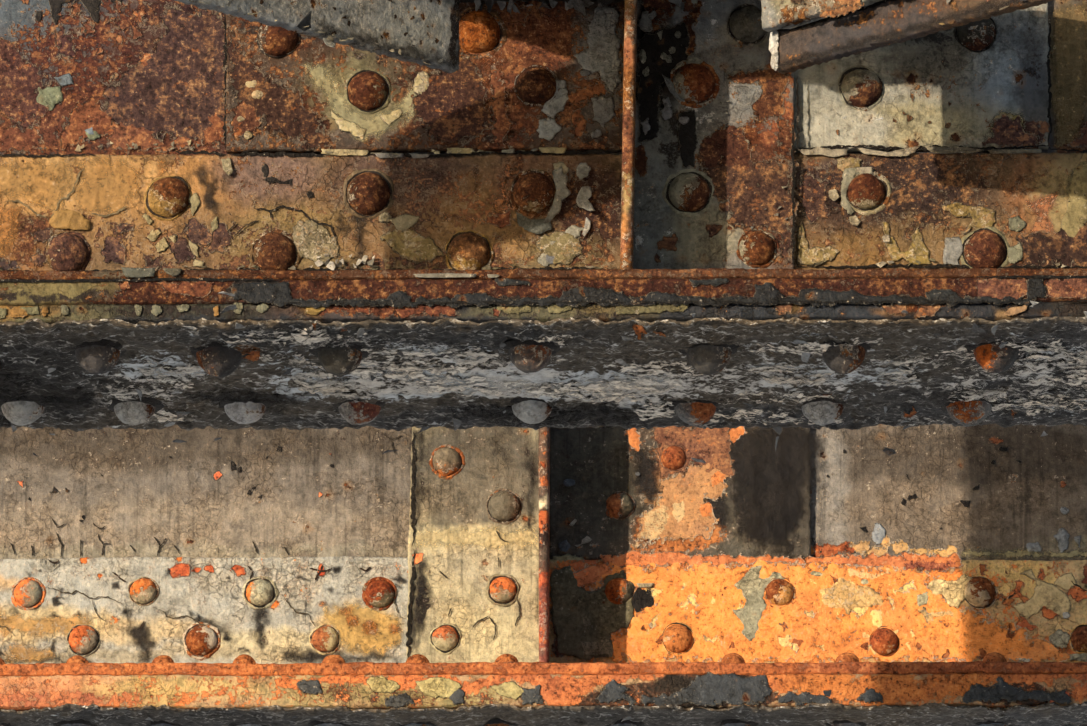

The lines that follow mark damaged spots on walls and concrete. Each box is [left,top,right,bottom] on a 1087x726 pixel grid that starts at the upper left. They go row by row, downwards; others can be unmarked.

peeling [297,7,354,47]
peeling [474,0,621,139]
peeling [768,16,828,71]
peeling [121,213,207,278]
corrosion [0,0,340,270]
corrosion [143,217,232,298]
peeling [213,79,1047,349]
corrosion [696,67,830,264]
corrosion [975,192,1087,299]
peeling [550,536,654,661]
corrosion [571,426,1073,708]
corrosion [366,676,465,708]